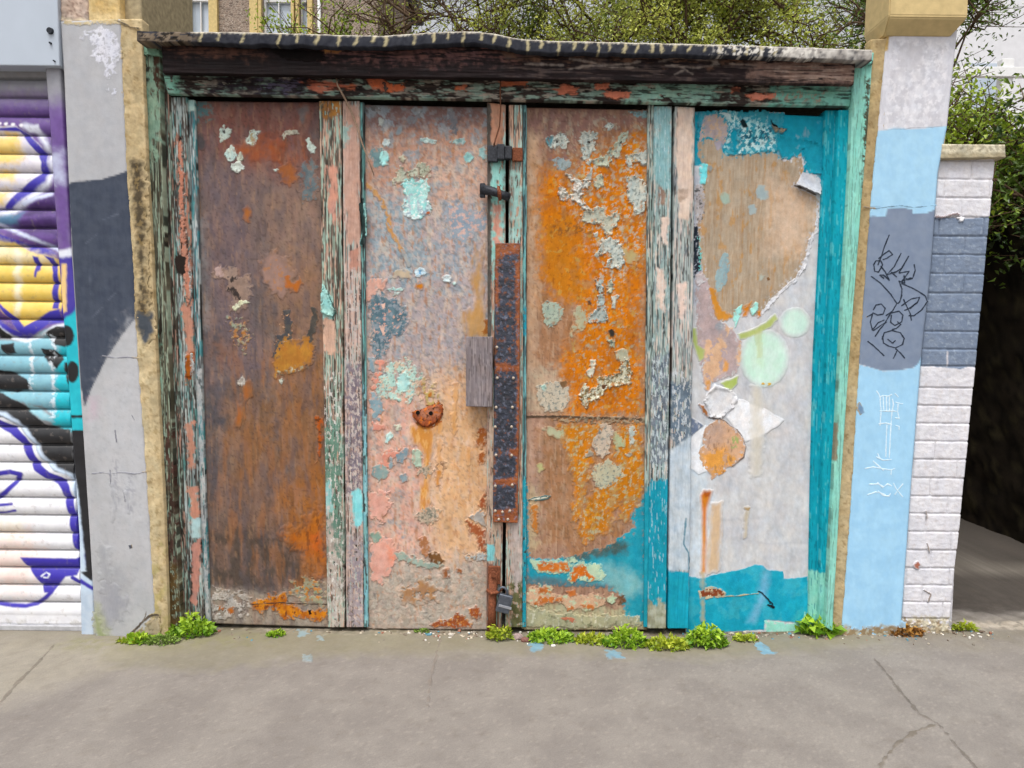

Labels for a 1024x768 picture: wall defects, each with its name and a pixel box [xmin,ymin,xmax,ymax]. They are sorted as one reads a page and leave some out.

peeling [219,124,261,174]
peeling [367,116,433,221]
crack [863,203,936,211]
peeling [535,122,647,413]
peeling [693,92,823,480]
peeling [367,356,424,407]
corrosion [408,374,459,512]
corrosion [275,499,327,581]
peeling [368,489,487,629]
peeling [521,556,643,630]
corrosion [699,488,725,623]
crack [874,658,978,768]